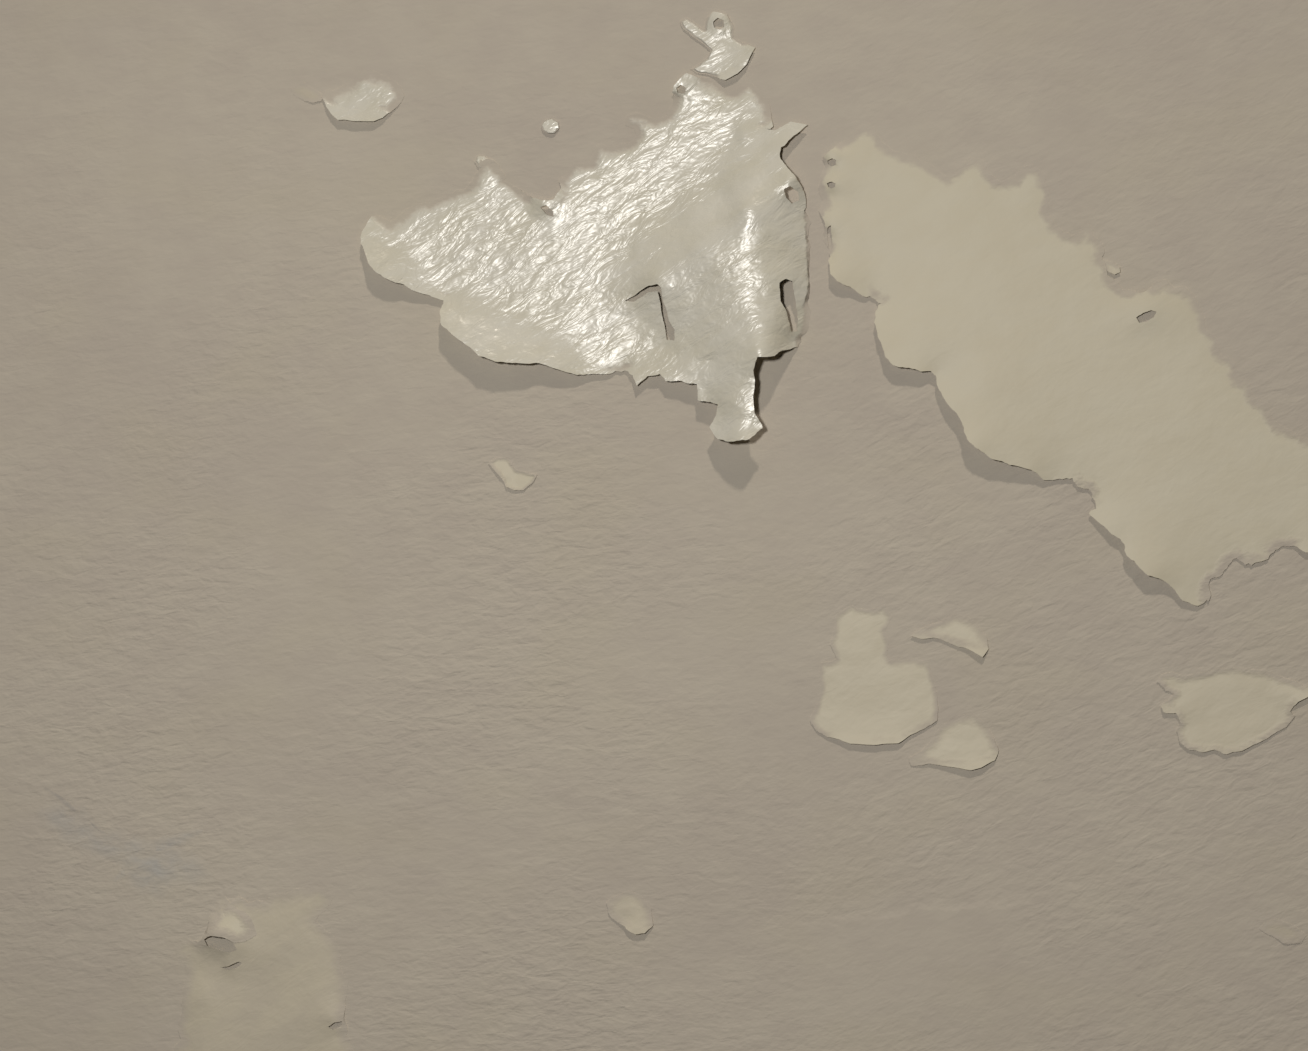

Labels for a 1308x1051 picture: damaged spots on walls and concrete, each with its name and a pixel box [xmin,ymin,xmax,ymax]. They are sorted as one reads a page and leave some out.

peeling [322,69,404,121]
peeling [360,12,1308,606]
peeling [810,604,999,770]
peeling [1157,667,1308,754]
peeling [606,891,653,935]